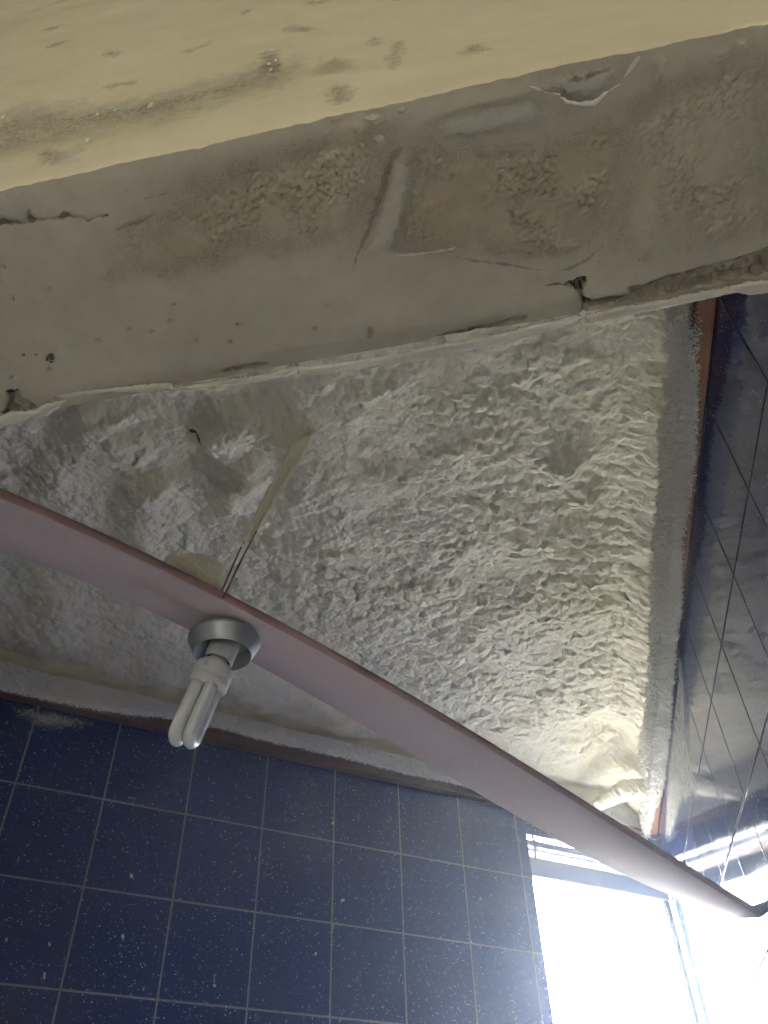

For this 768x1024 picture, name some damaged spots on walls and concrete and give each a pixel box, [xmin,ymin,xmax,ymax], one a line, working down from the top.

flaking render [528,55,641,106]
crack [0,211,109,225]
crack [549,276,591,306]